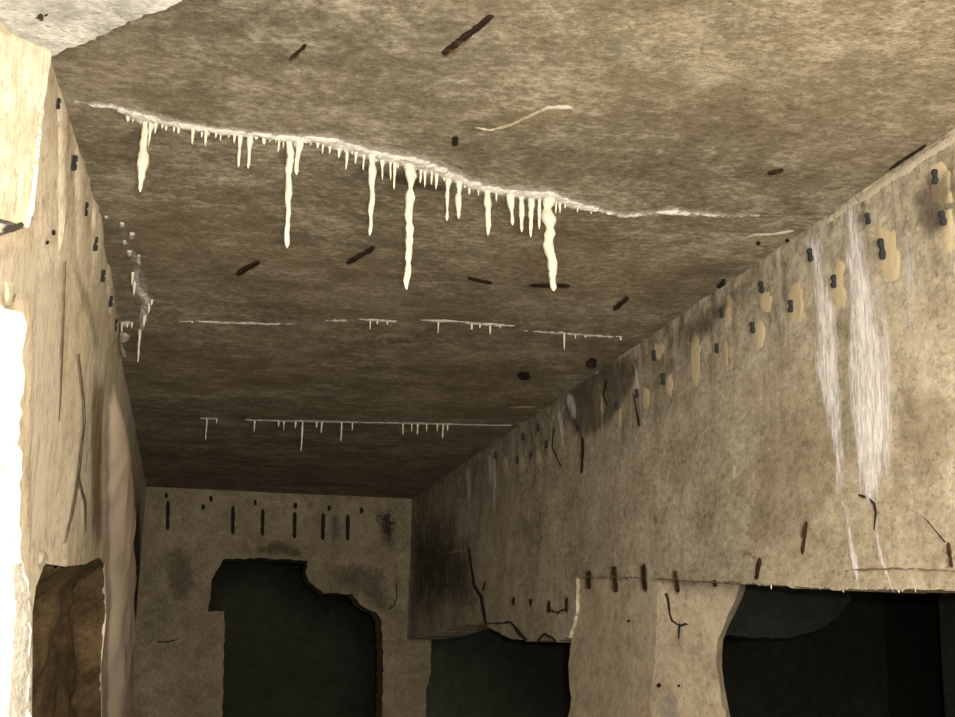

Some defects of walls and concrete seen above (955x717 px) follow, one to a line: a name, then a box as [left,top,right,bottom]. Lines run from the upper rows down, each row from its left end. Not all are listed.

rust [441,14,494,56]
crack [74,101,767,291]
flaking render [813,133,955,253]
damp [117,222,154,362]
rust [236,260,260,276]
rust [346,246,375,264]
peeling [877,225,900,282]
damp [806,206,889,499]
spalling [0,88,119,717]
crack [858,494,877,530]
damp [763,526,923,592]
crack [583,576,735,639]